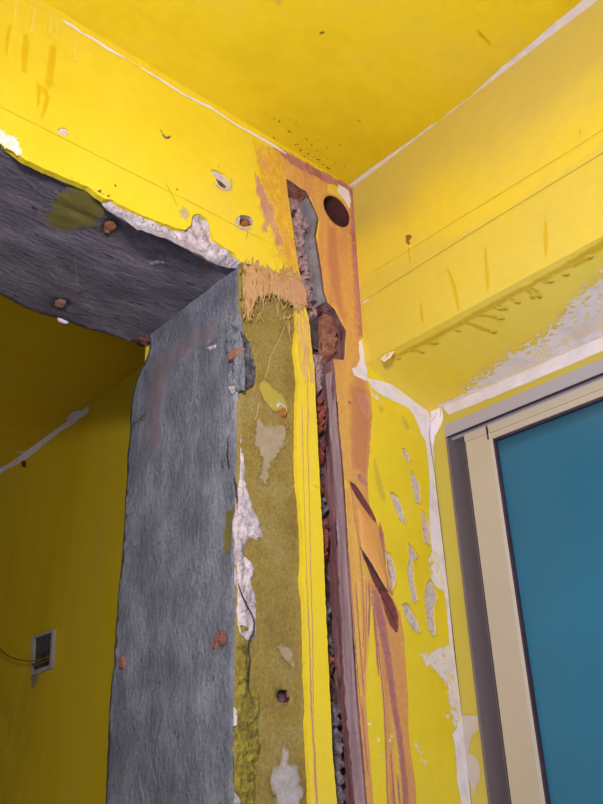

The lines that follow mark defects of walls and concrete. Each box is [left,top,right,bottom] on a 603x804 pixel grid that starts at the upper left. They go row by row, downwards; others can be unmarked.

water stain [36,16,60,121]
spalling [101,202,239,269]
spalling [402,448,431,547]
flaking render [350,481,438,638]
spalling [232,438,263,804]